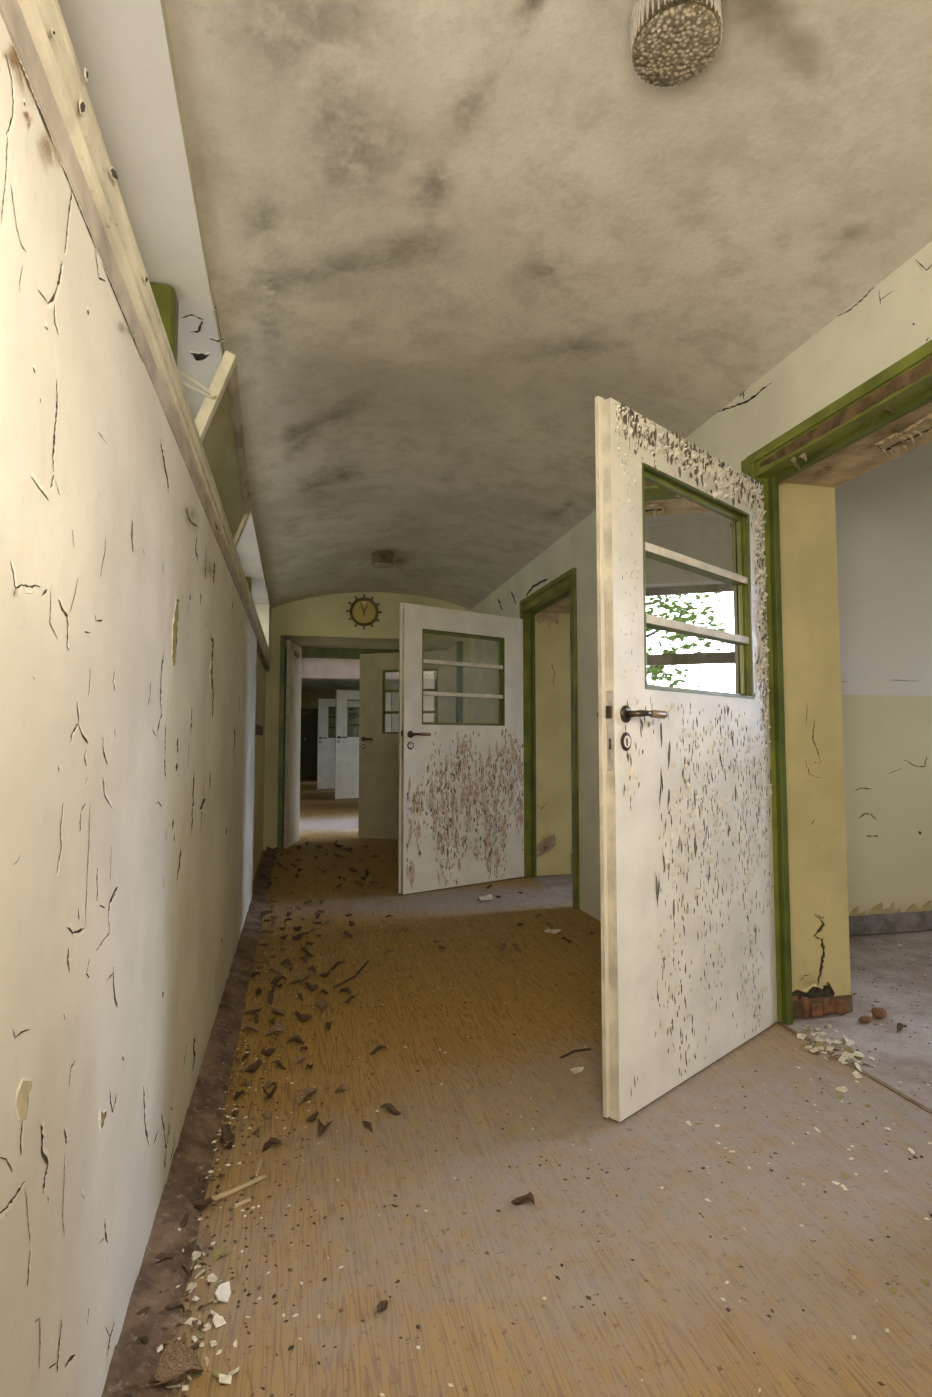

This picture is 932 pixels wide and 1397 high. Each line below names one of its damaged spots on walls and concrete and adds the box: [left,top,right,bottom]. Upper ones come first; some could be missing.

crack [1,44,143,361]
crack [31,364,59,500]
crack [10,521,145,649]
crack [56,671,118,1006]
crack [148,436,242,889]
peeling [406,729,557,889]
peeling [615,402,774,1077]
crack [799,913,826,985]
spalling [15,1077,33,1122]
crack [109,1053,174,1167]
crack [0,1120,109,1285]
crack [35,1305,115,1372]